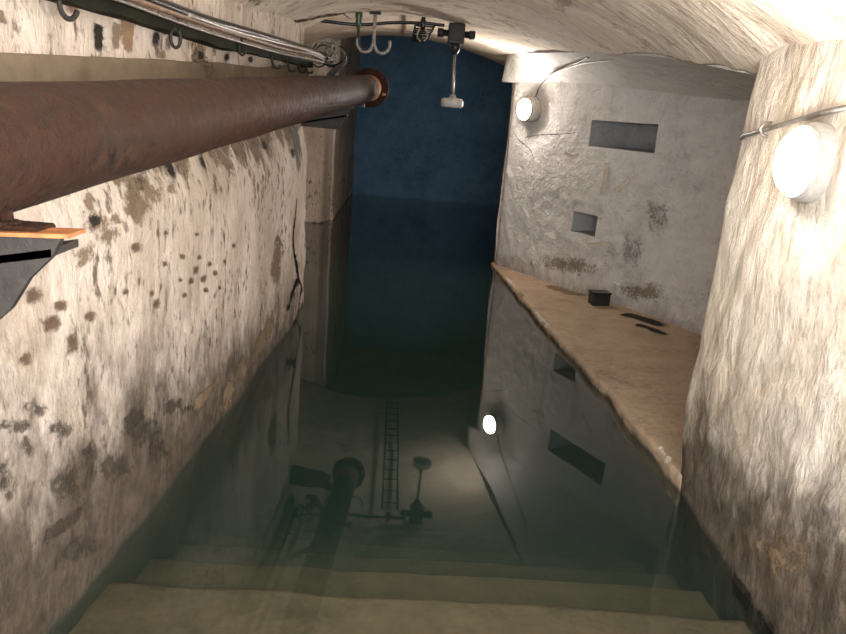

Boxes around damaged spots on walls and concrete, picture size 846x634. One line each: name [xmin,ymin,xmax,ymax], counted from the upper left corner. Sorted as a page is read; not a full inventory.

crack [286,198,303,325]
leakage [0,398,47,455]
leakage [50,421,73,437]
leakage [0,461,11,498]
leakage [45,466,84,543]
leakage [83,444,134,483]
leakage [755,526,826,579]
leakage [733,572,773,634]